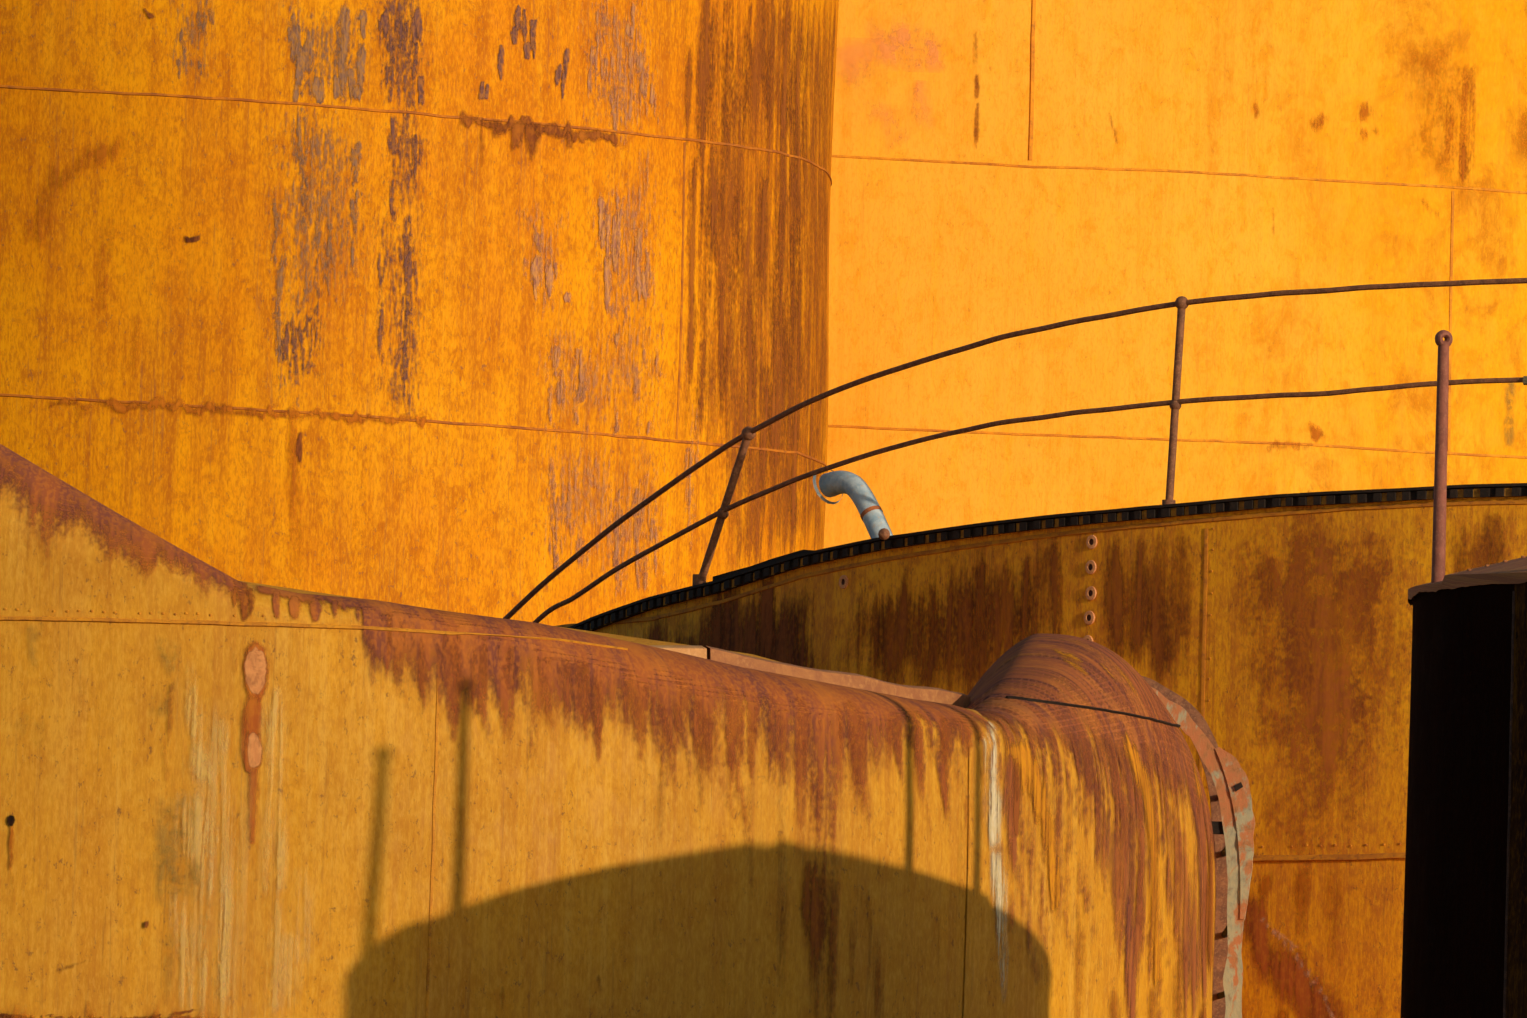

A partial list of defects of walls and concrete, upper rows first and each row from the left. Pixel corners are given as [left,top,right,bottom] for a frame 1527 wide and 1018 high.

rust [460,112,618,159]
rust [685,0,836,562]
rust [50,397,427,507]
rust [1298,426,1323,448]
rust [0,444,1216,1018]
leakage [984,722,1006,980]
rust [1243,871,1344,1018]